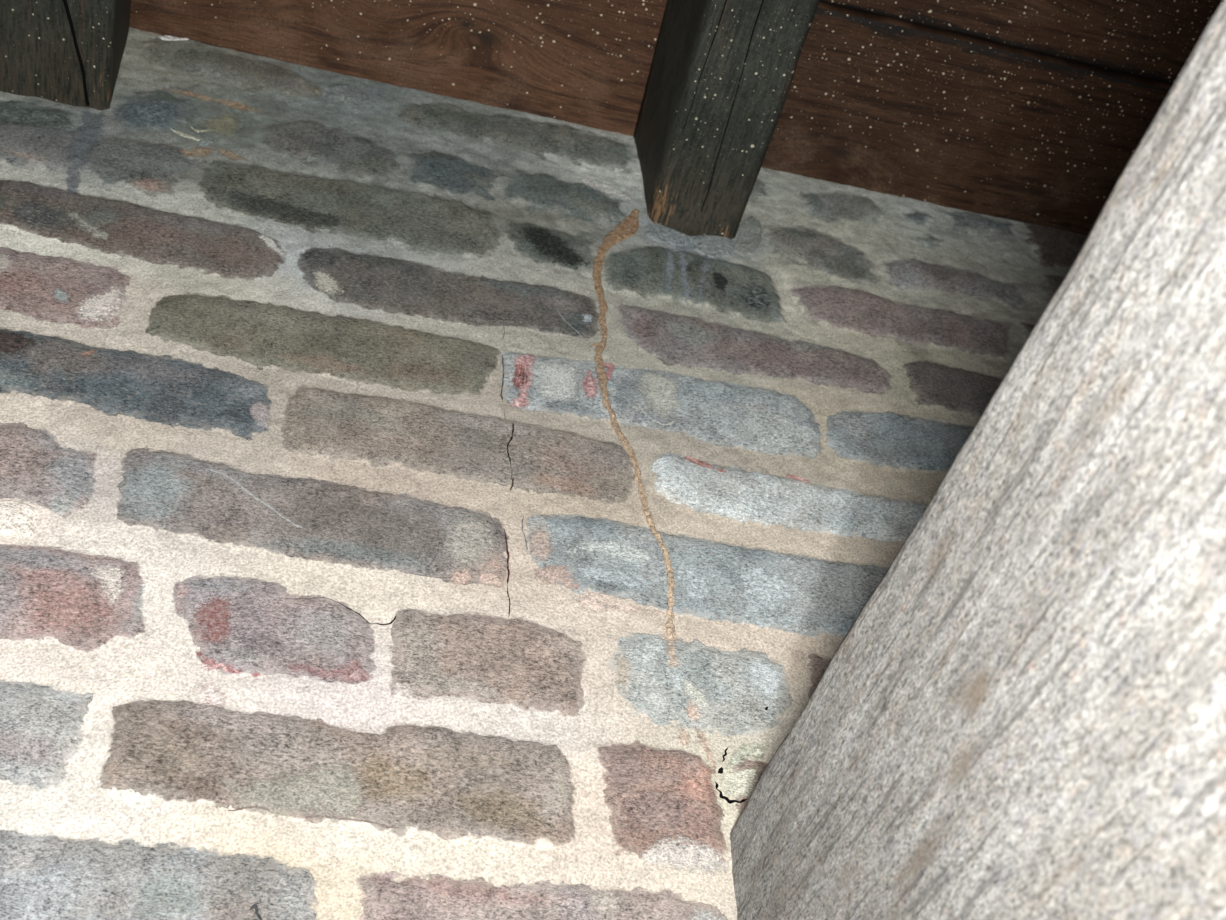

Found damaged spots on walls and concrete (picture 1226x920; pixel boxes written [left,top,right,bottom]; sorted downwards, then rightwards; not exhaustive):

crack [500,321,514,490]
crack [504,516,528,618]